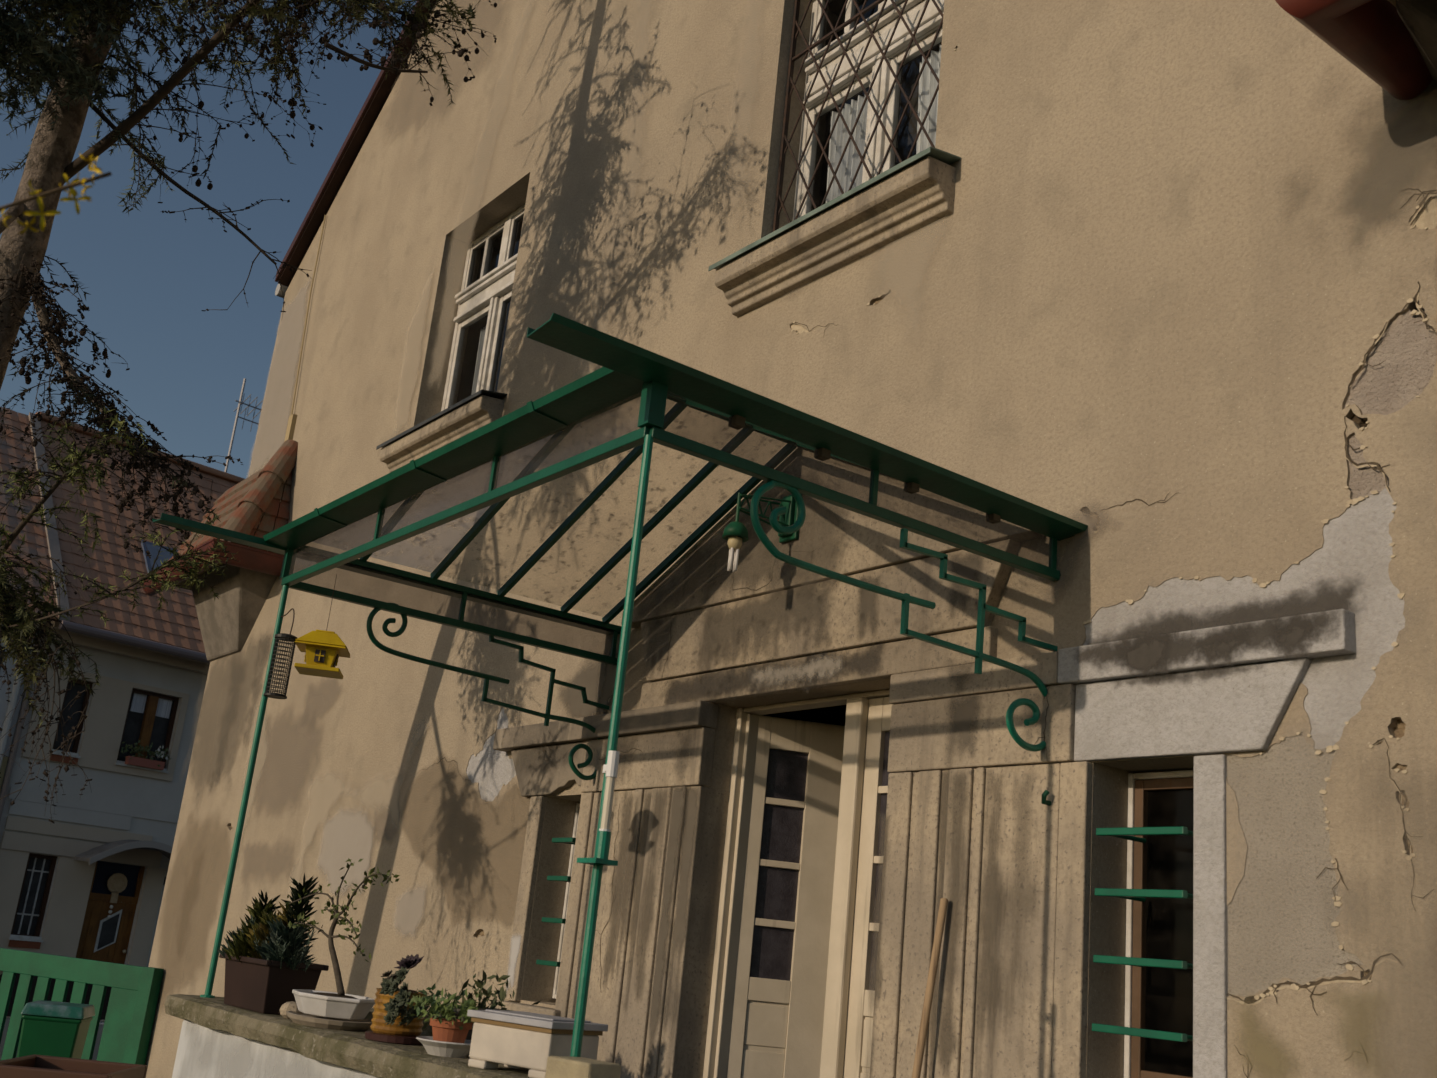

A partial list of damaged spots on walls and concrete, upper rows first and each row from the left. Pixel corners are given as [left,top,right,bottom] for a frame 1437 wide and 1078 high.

crack [1400,188,1437,225]
crack [1102,492,1176,510]
damp [560,653,619,718]
damp [641,478,882,705]
damp [1078,584,1354,684]
spalling [1083,298,1437,1004]
damp [240,710,266,843]
peeling [466,708,516,803]
crack [1372,738,1434,911]
damp [605,788,698,1074]
crack [1316,858,1348,907]
crack [1227,953,1403,1016]